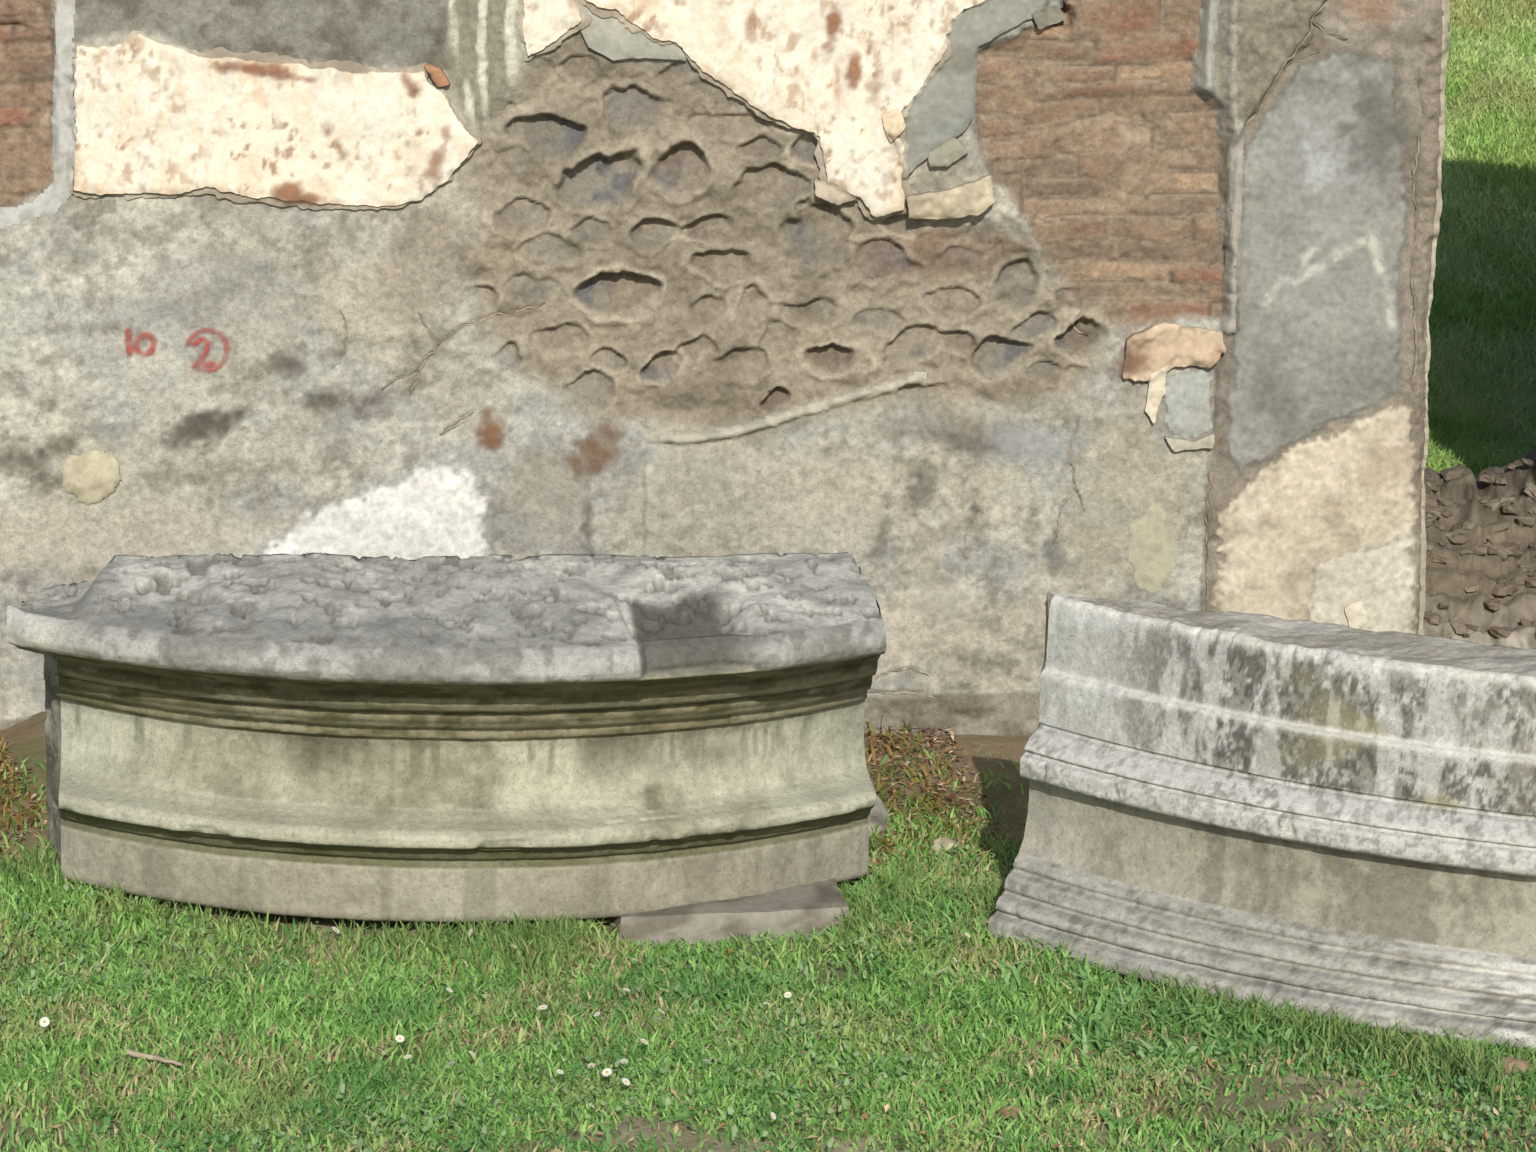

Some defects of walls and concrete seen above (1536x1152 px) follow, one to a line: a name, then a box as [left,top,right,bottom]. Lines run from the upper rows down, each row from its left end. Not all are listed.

spalling [0,0,55,207]
crack [382,302,545,397]
spalling [73,0,1419,634]
rust [480,422,502,448]
rust [573,440,611,470]
crack [1053,415,1085,544]